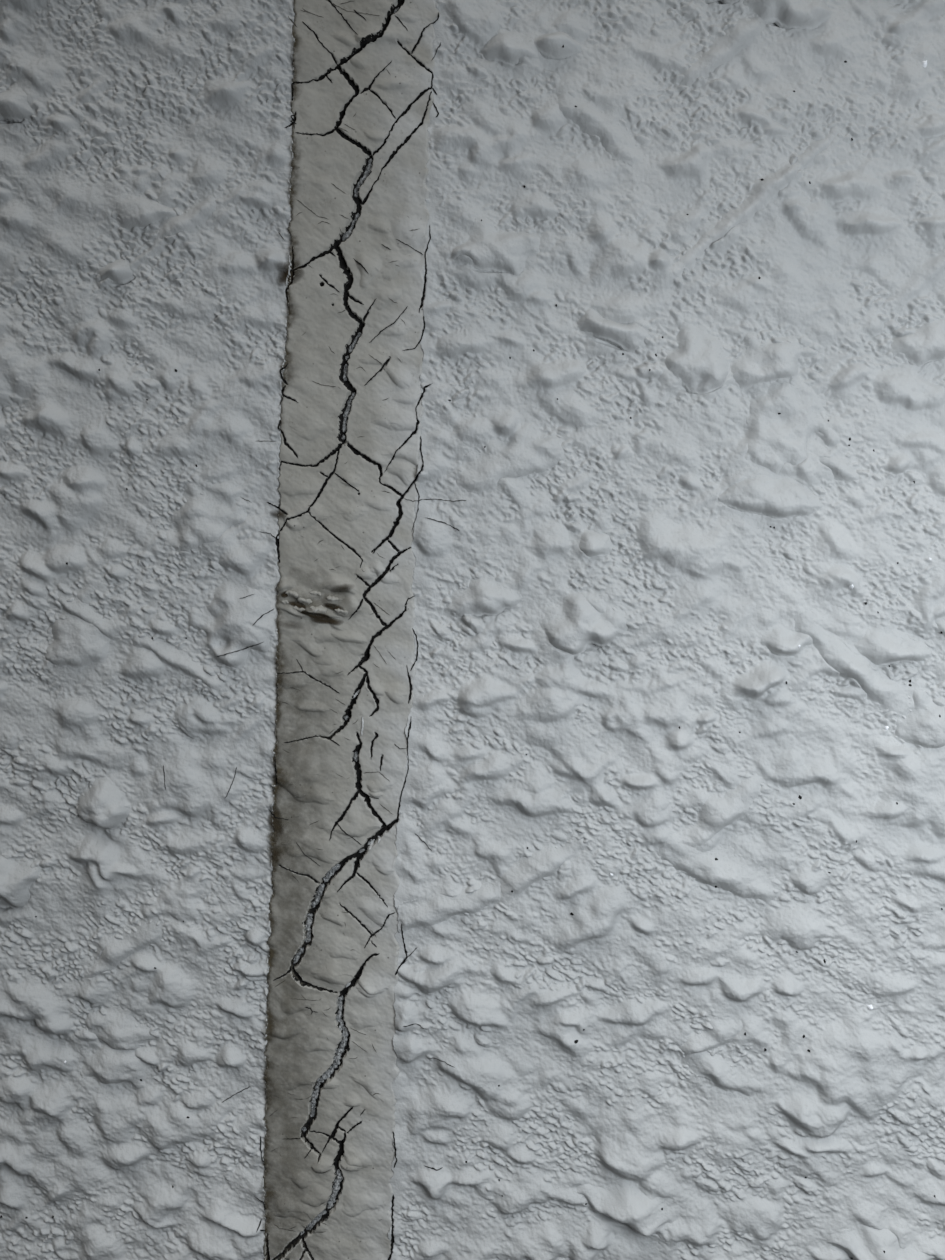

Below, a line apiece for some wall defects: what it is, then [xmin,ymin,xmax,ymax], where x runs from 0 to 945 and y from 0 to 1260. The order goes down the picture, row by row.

crack [217,0,466,1260]